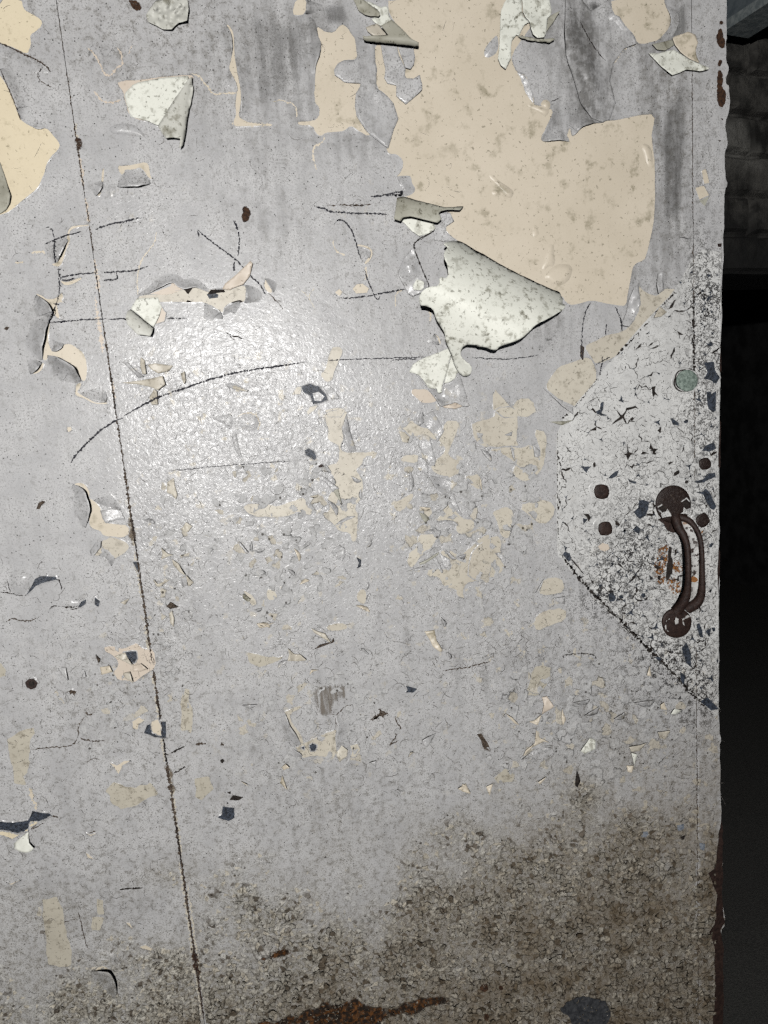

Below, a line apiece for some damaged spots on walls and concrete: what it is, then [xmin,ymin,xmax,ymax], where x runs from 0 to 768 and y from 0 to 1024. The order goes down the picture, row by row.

peeling [0,0,60,216]
peeling [117,73,195,127]
corrosion [716,21,726,120]
peeling [26,277,109,405]
peeling [137,261,277,325]
peeling [375,0,680,639]
peeling [204,346,390,649]
crack [142,231,725,885]
corrosion [655,545,698,593]
peeling [0,590,719,1024]
corrosion [261,950,289,960]
corrosion [258,997,448,1024]